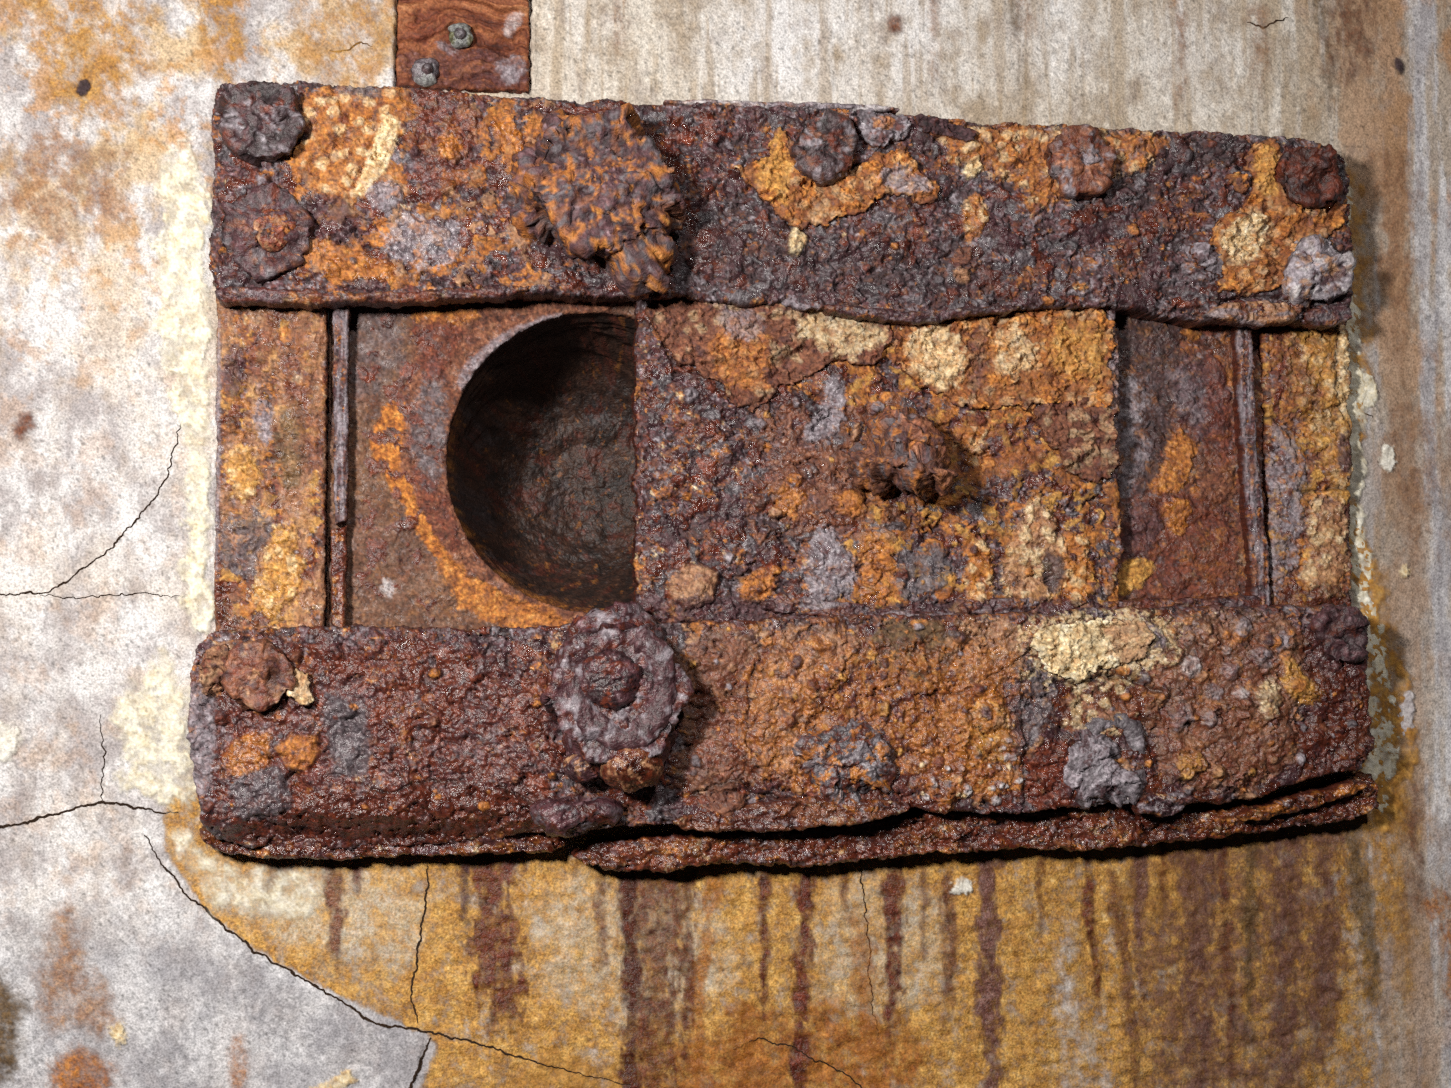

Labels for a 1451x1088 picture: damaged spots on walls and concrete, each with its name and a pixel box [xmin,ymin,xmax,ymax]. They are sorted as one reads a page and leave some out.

corrosion [30,0,152,112]
corrosion [199,0,244,83]
corrosion [2,137,111,242]
corrosion [732,108,976,231]
corrosion [1189,137,1347,299]
corrosion [645,299,1119,484]
crack [0,401,189,599]
leakage [1380,444,1397,472]
corrosion [285,668,316,706]
corrosion [1029,617,1157,684]
crack [0,715,631,1088]
corrosion [164,757,1415,1088]